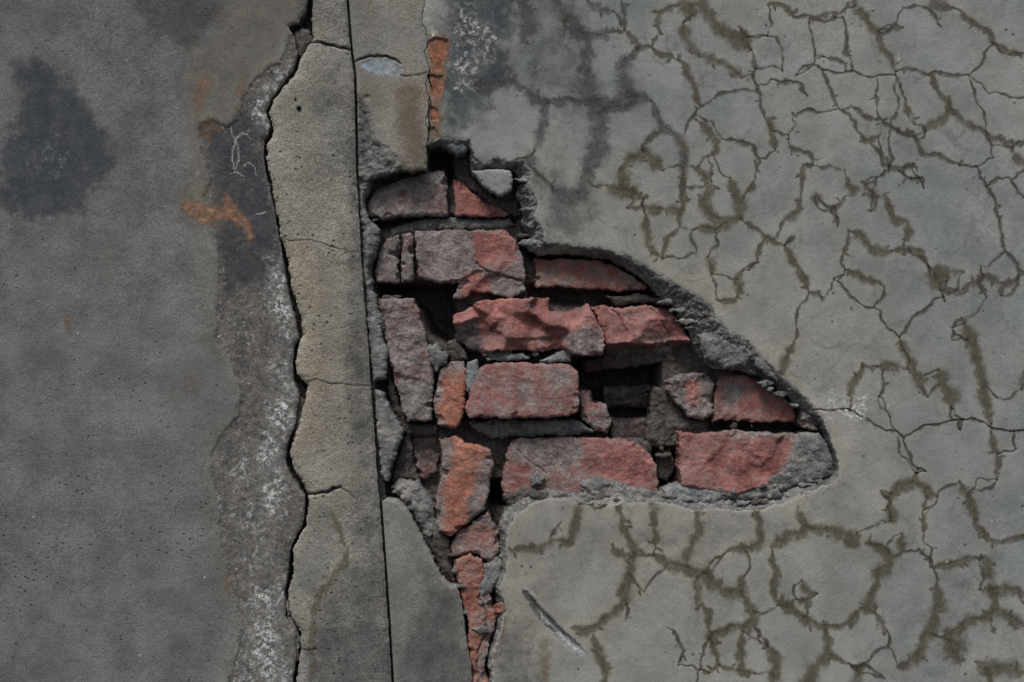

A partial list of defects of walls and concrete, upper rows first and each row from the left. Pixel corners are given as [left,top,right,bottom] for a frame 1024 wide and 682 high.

damp [0,61,114,216]
corrosion [182,195,254,243]
peeling [199,0,310,682]
crack [266,116,370,682]
crack [287,0,432,136]
spalling [357,101,839,682]
crack [469,0,1024,682]